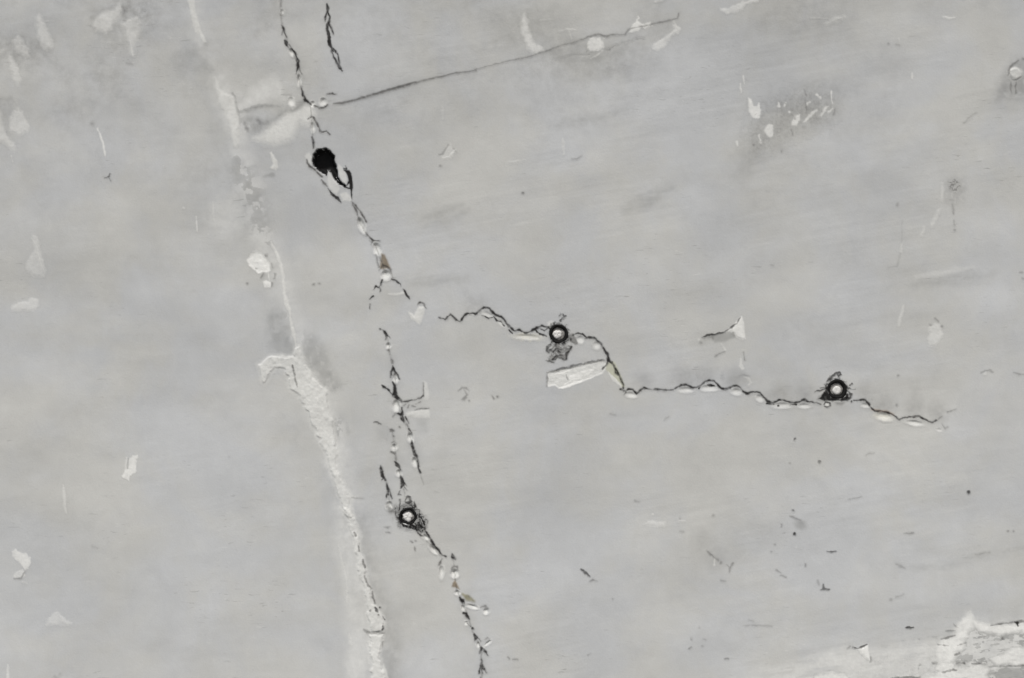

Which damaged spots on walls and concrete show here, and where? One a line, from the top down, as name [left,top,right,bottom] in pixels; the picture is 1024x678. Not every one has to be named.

crack [278,0,685,151]
peeling [326,163,351,203]
peeling [245,249,277,289]
spalling [544,332,606,390]
peeling [696,315,753,388]
crack [350,200,822,678]
crack [852,377,957,434]
peeling [723,606,1024,678]